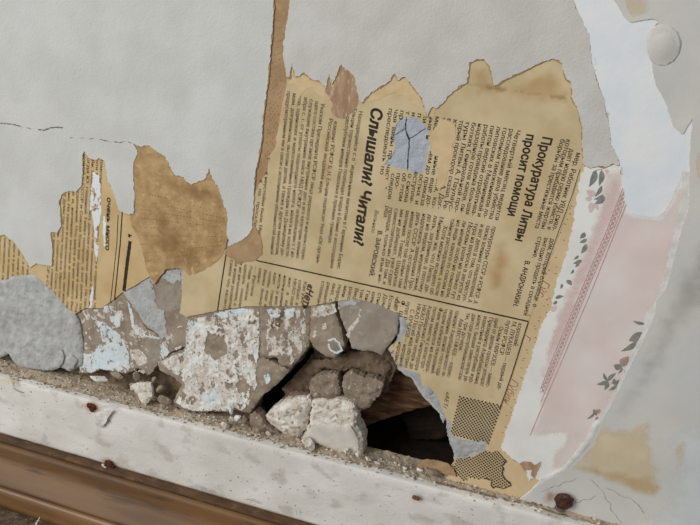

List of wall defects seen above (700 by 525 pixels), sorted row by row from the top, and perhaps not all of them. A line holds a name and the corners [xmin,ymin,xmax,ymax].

crack [0,123,73,138]
crack [395,118,424,170]
peeling [56,301,362,418]
spalling [366,330,484,465]
damp [576,425,654,493]